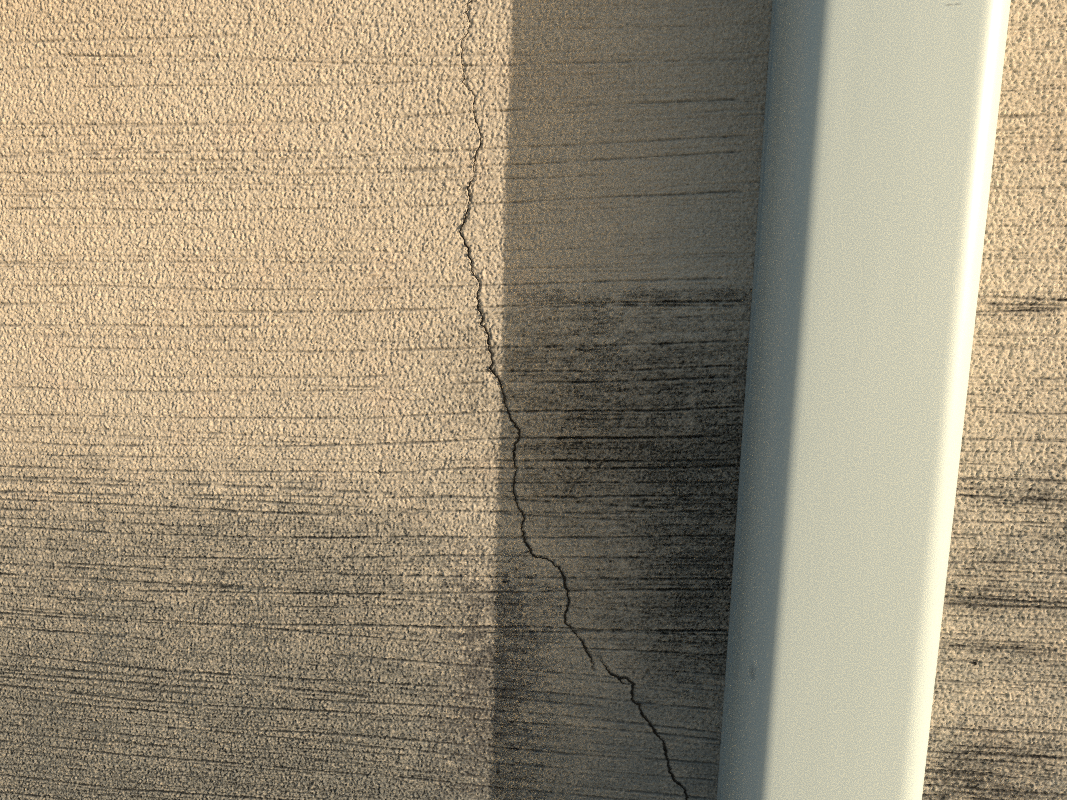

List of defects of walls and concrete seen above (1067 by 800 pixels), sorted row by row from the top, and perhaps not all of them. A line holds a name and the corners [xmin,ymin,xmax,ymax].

leakage [992,298,1067,312]
crack [459,0,689,800]
leakage [505,318,747,681]
leakage [990,480,1067,507]
leakage [945,554,1067,612]
leakage [0,477,551,800]
leakage [922,728,1063,800]